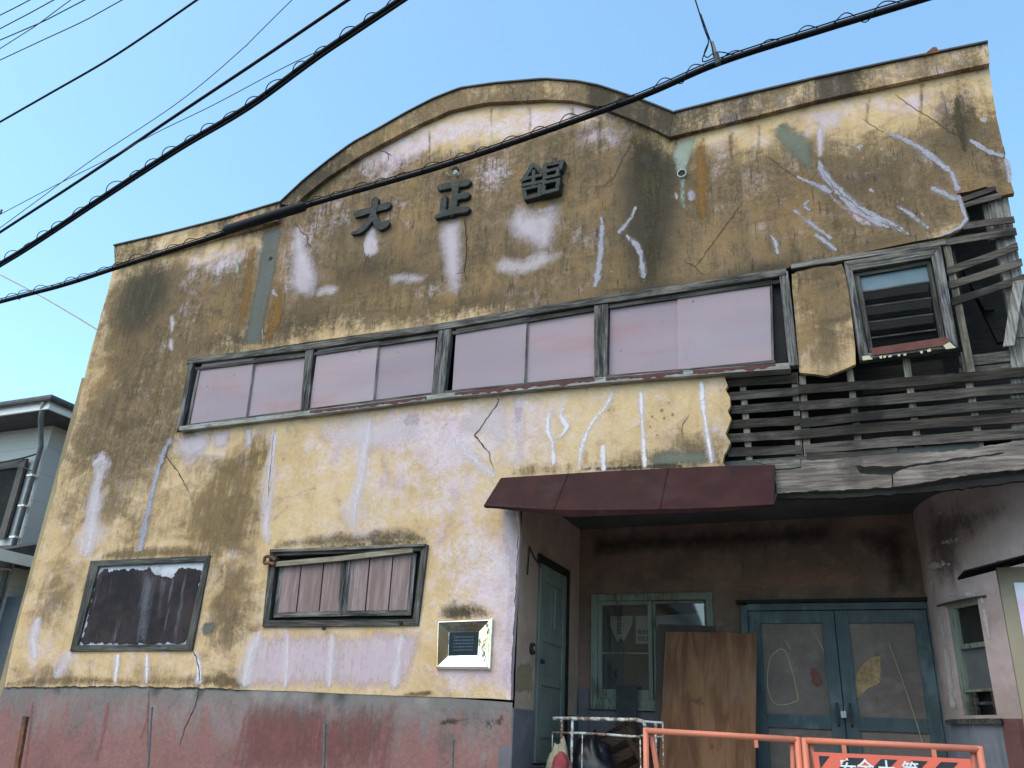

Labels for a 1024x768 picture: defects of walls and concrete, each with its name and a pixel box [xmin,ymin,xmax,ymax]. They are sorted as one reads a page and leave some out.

leakage [952,97,967,152]
peeling [440,223,459,288]
peeling [499,206,555,270]
crack [683,202,743,275]
crack [457,398,499,476]
crack [138,437,188,552]
leakage [103,439,267,560]
crack [5,618,260,746]